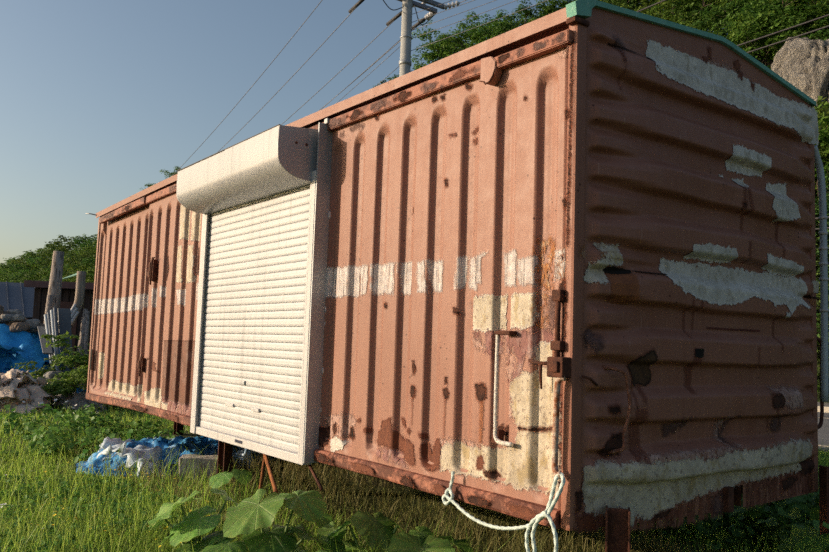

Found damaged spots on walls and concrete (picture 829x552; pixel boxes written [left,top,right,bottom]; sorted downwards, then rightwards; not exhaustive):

peeling [646,40,819,146]
corrosion [532,32,574,341]
peeling [719,145,801,222]
peeling [554,250,565,280]
peeling [578,242,623,285]
peeling [658,243,819,318]
peeling [98,352,168,410]
corrosion [152,340,195,421]
peeling [357,249,563,495]
corrosion [315,411,356,465]
corrosion [598,432,623,458]
peeling [582,438,813,527]